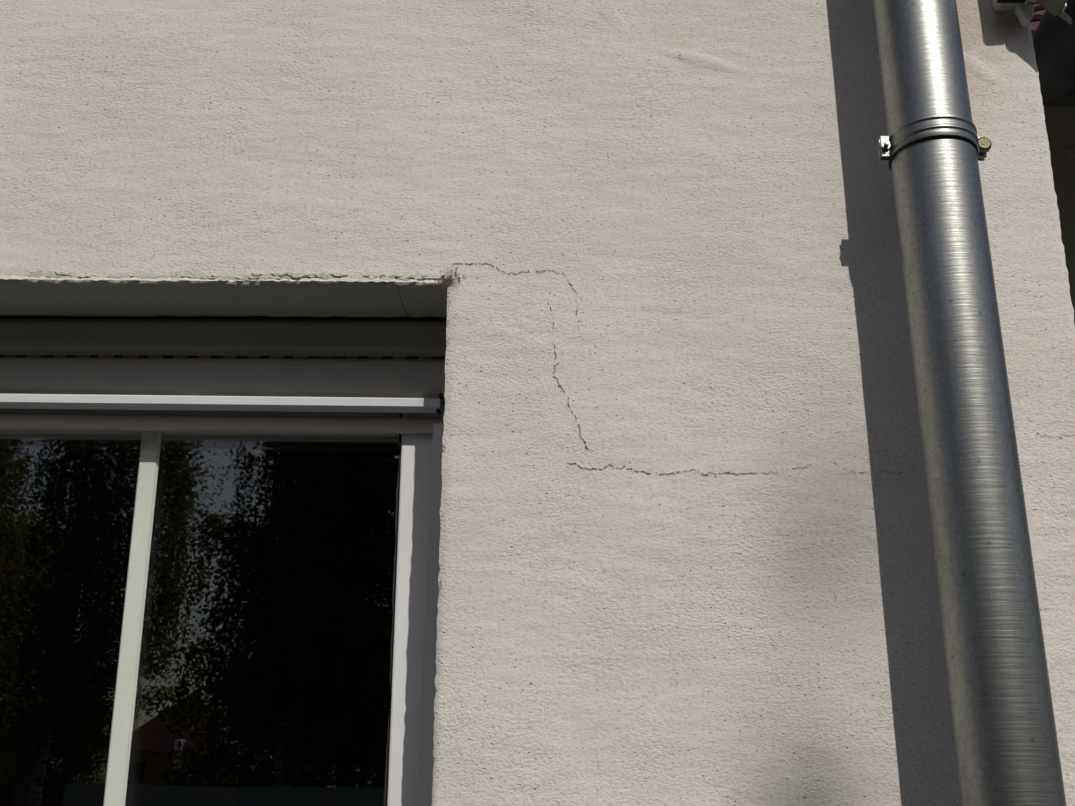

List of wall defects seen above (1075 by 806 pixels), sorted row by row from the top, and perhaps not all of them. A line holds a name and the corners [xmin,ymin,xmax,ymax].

crack [452,263,907,476]